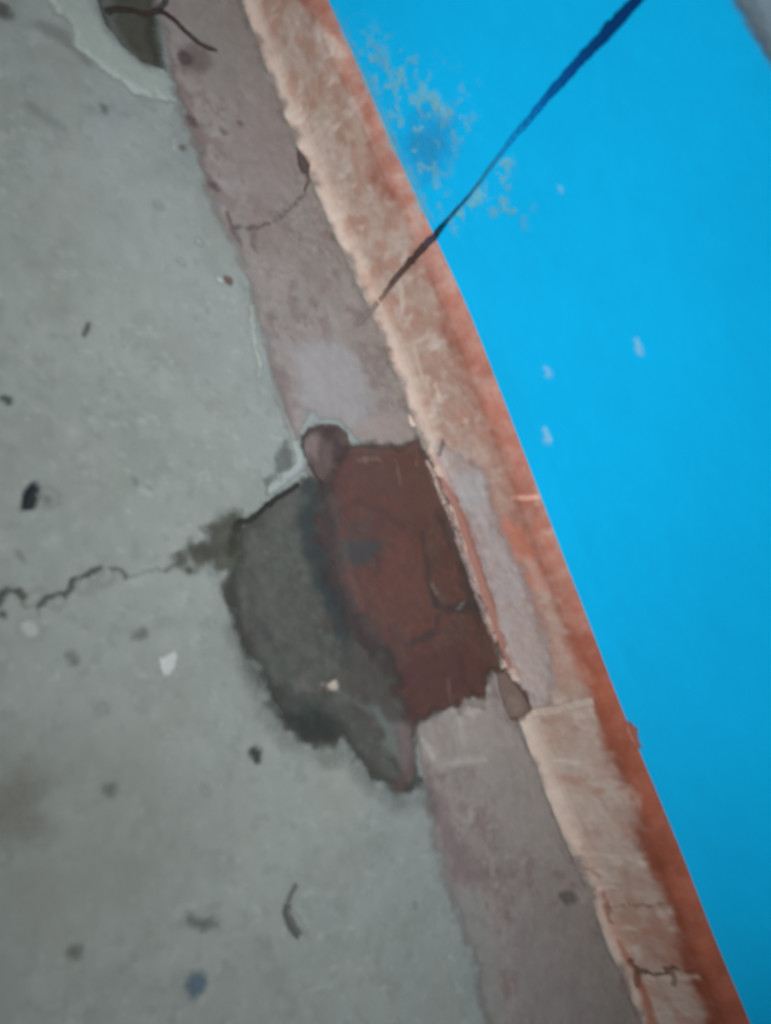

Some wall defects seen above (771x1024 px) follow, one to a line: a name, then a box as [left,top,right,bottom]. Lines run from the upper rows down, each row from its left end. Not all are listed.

peeling [369,51,452,181]
peeling [297,148,310,192]
peeling [457,158,517,217]
crack [354,0,643,327]
crack [227,197,302,242]
leakage [170,513,244,573]
crack [0,566,127,619]
spalling [221,415,555,794]
spalling [283,883,308,940]
crack [628,958,680,988]